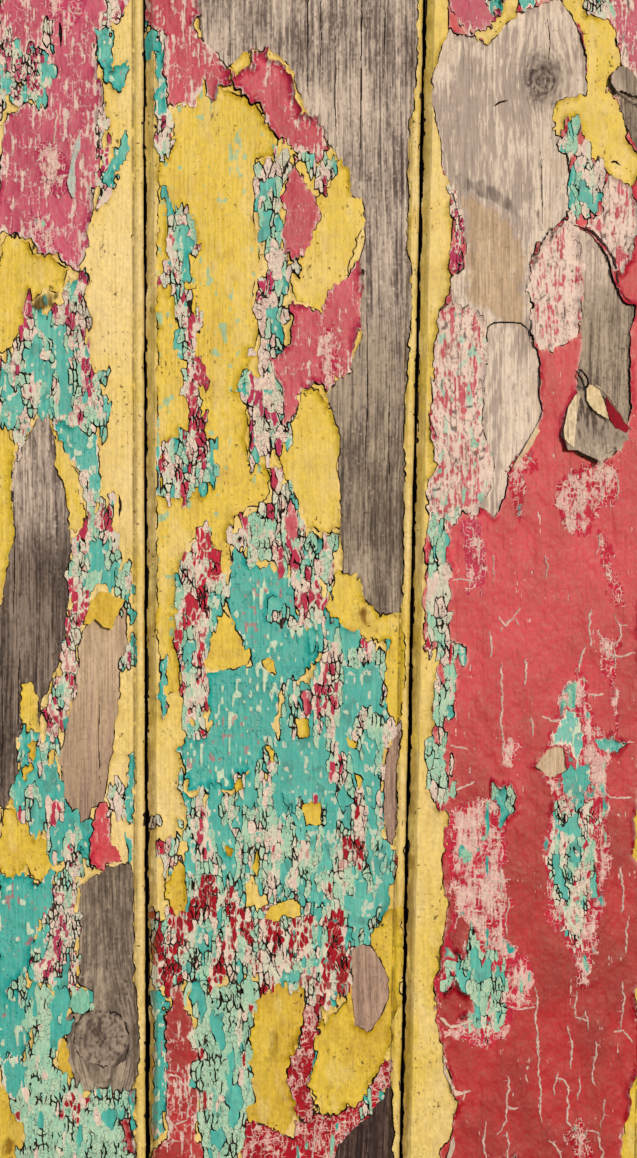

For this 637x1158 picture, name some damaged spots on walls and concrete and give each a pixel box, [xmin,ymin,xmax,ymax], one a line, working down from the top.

peeling [0,0,140,1158]
peeling [145,0,637,1158]
crack [433,447,636,1158]